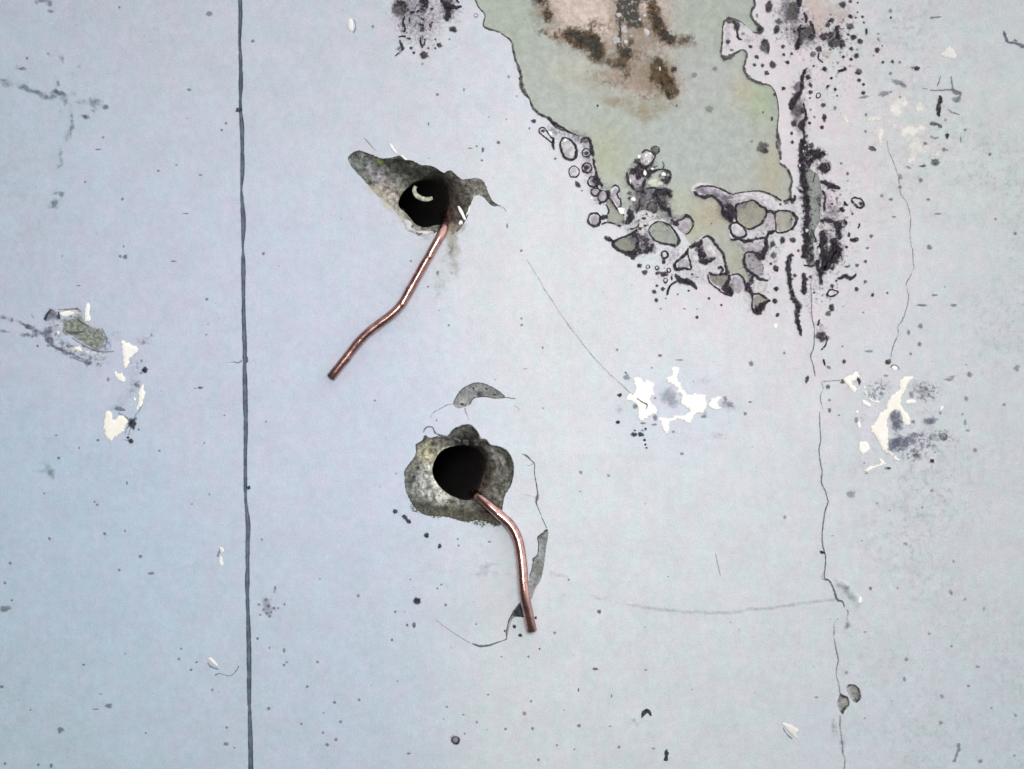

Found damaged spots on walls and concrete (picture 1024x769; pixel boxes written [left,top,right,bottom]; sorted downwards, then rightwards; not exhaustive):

spalling [348,139,505,237]
peeling [475,0,794,287]
peeling [804,151,822,268]
spalling [861,76,962,168]
spalling [2,303,148,443]
spalling [404,382,519,527]
spalling [618,366,733,449]
crack [810,292,848,620]
spalling [844,371,948,474]